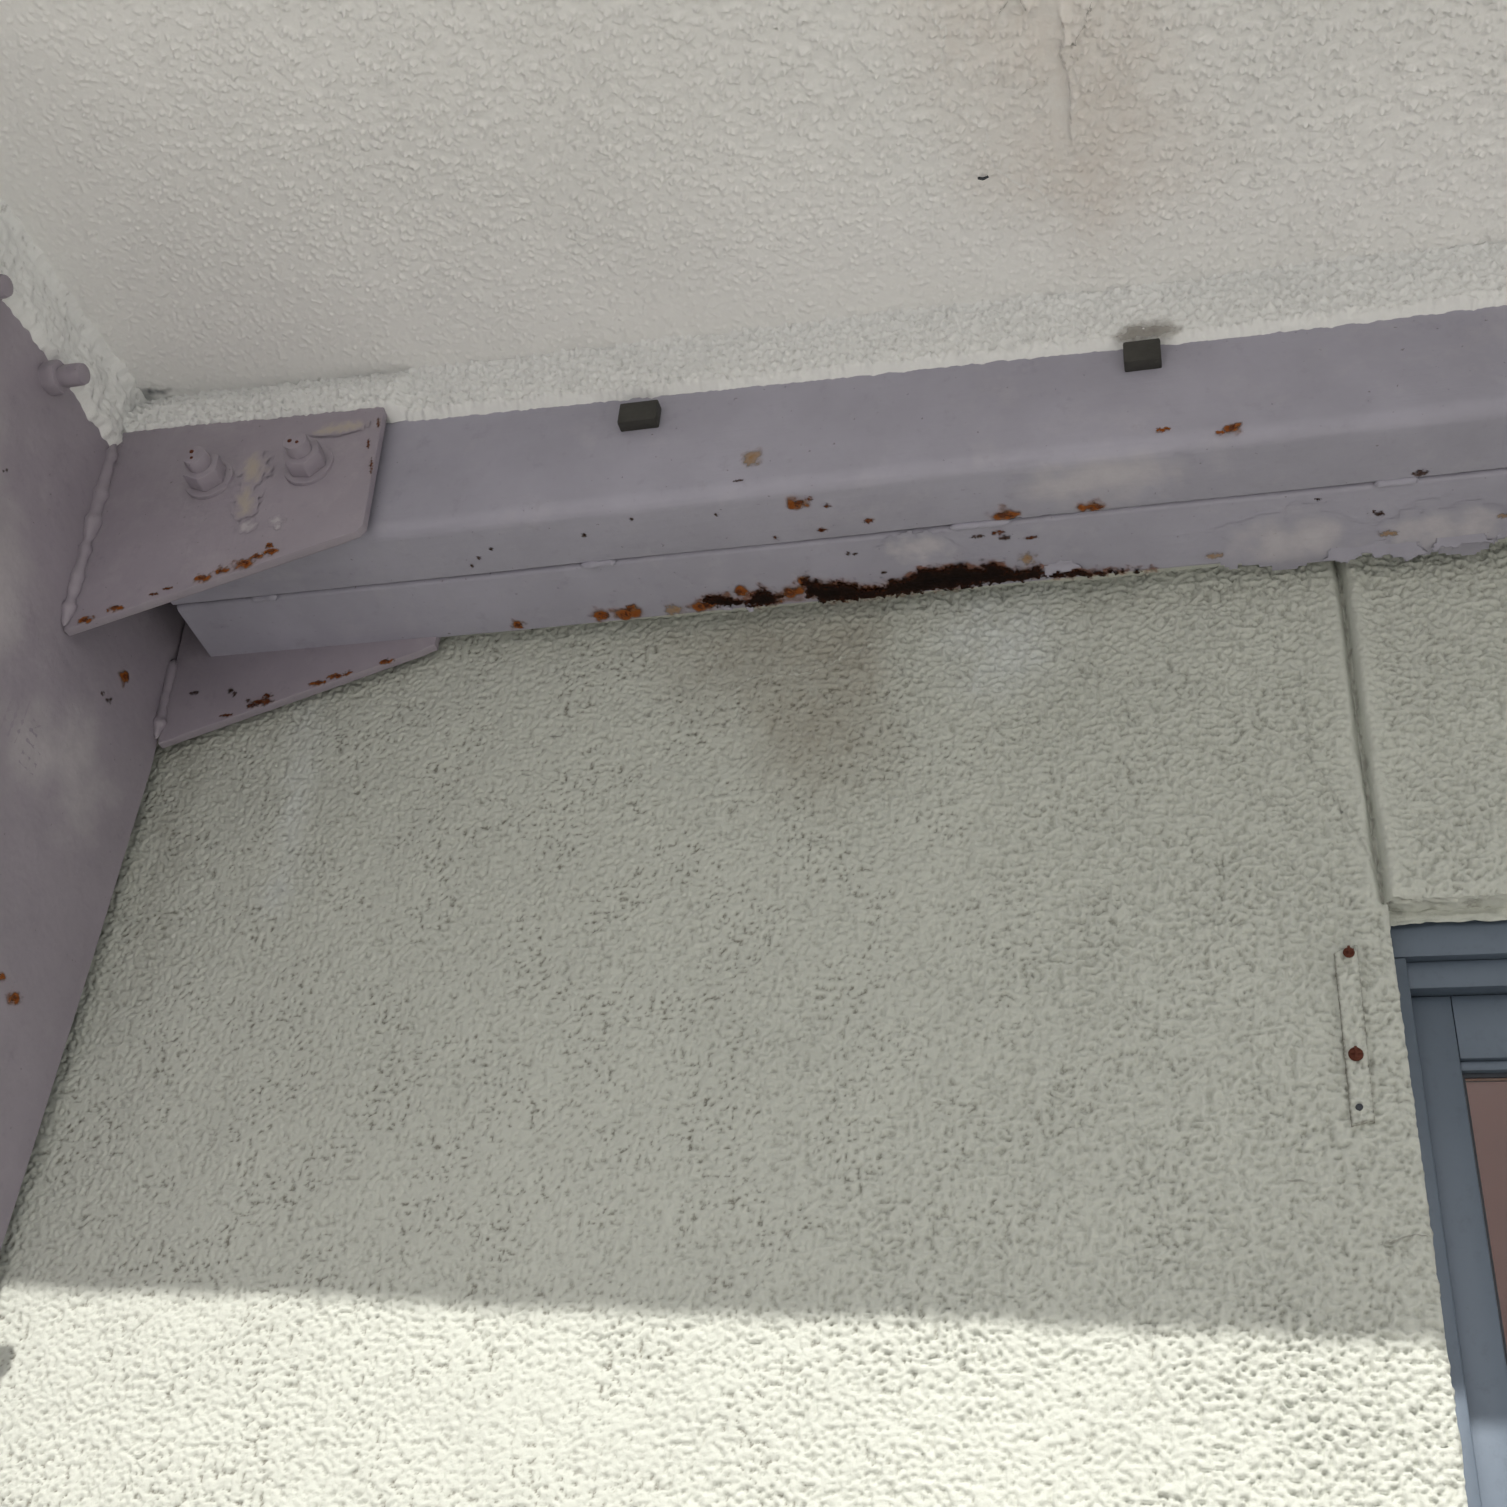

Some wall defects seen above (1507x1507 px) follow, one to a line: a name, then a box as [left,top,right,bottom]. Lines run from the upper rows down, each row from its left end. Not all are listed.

crack [1022,2,1092,124]
corrosion [1216,422,1242,434]
corrosion [733,451,761,482]
corrosion [787,496,831,510]
corrosion [1077,503,1104,512]
corrosion [194,543,279,582]
corrosion [666,510,1157,615]
corrosion [78,605,124,624]
corrosion [309,671,352,686]
corrosion [219,693,274,717]
corrosion [0,973,20,1005]